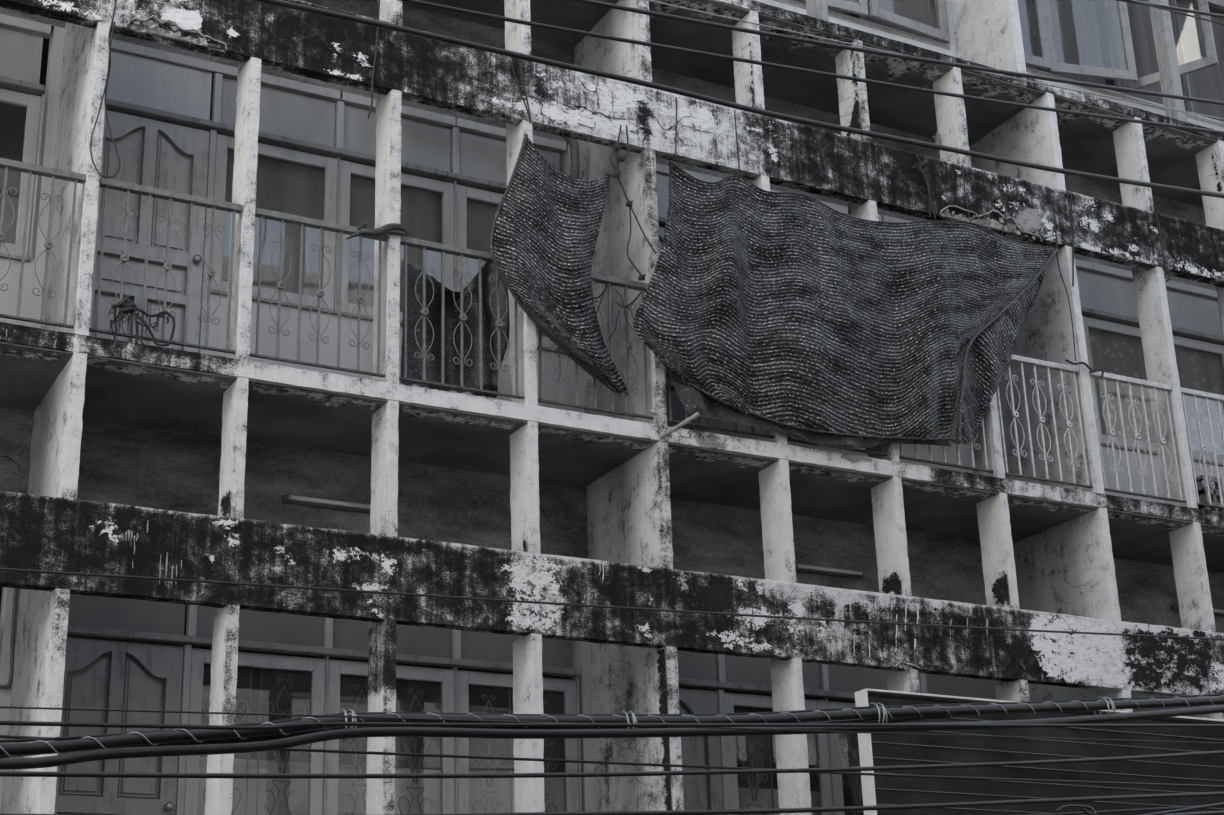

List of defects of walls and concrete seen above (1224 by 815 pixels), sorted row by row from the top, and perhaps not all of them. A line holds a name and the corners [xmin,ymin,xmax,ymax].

water stain [534,82,549,101]
water stain [634,99,653,144]
water stain [847,50,861,136]
water stain [220,490,230,517]
water stain [656,646,667,714]
water stain [698,577,734,613]
water stain [810,571,1041,678]
peeling [1028,612,1130,688]
water stain [1119,624,1215,695]
water stain [661,737,671,811]